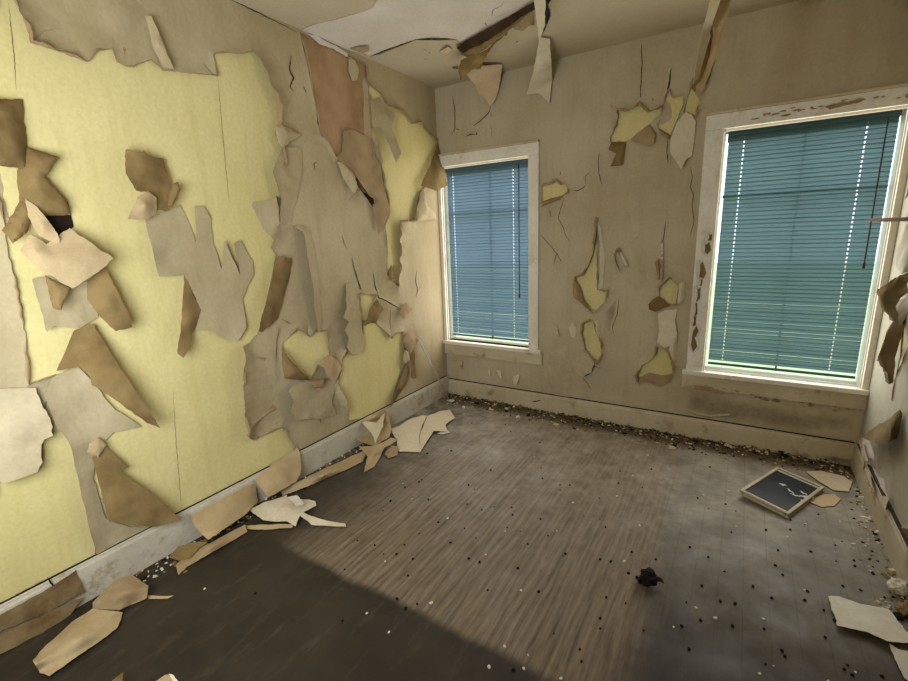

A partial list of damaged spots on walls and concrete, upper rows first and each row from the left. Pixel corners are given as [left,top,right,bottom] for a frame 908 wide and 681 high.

peeling [540,169,590,207]
peeling [607,0,731,169]
peeling [752,94,908,120]
peeling [0,0,552,654]
peeling [568,216,629,389]
peeling [630,222,712,387]
peeling [856,225,908,509]